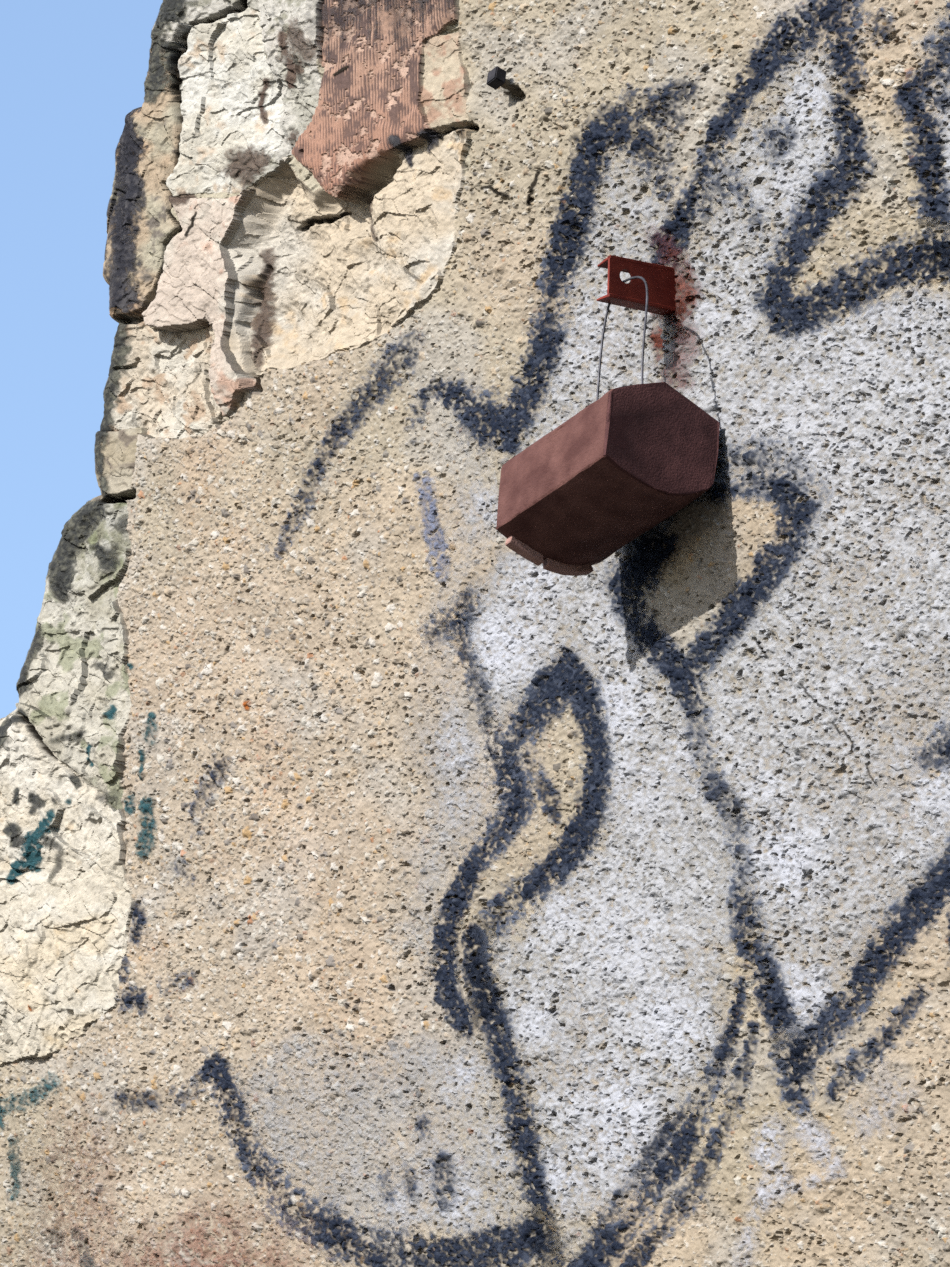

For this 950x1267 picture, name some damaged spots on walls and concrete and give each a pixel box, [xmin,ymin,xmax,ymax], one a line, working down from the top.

spalling [437,0,461,36]
crack [173,0,248,158]
crack [446,126,480,134]
crack [166,188,196,236]
spalling [109,6,478,439]
crack [302,212,350,231]
rust [672,270,699,317]
rust [649,314,668,359]
spalling [0,714,136,1065]